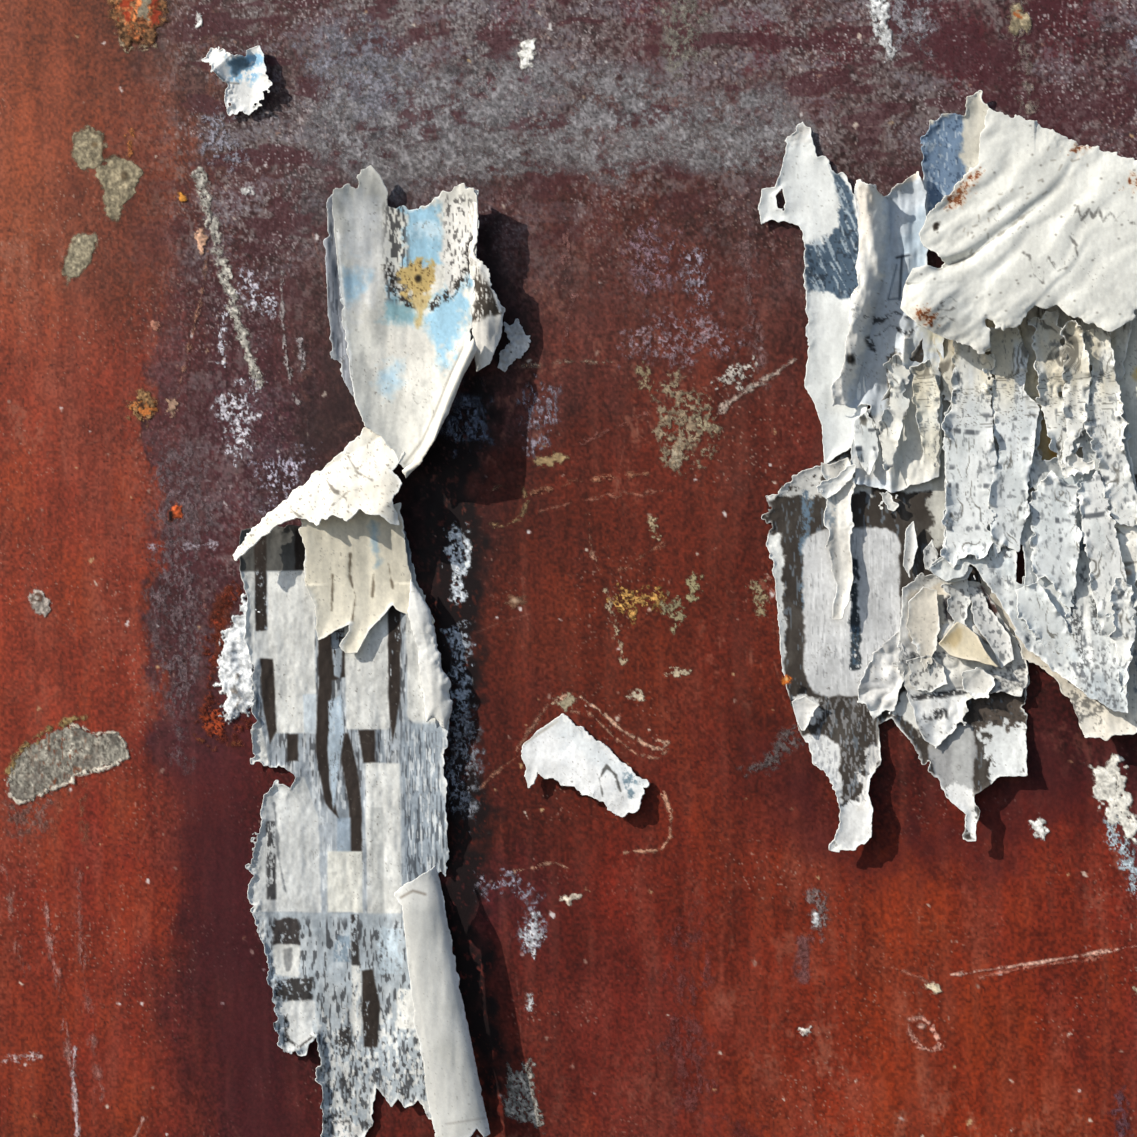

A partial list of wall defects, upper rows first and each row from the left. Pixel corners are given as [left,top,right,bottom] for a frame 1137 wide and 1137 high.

rust [107,0,169,53]
rust [1009,4,1031,55]
peeling [72,125,143,221]
peeling [62,233,97,280]
rust [127,389,178,421]
rust [168,505,182,521]
rust [193,580,252,751]
peeling [5,715,130,836]
peeling [1029,818,1049,840]
peeling [504,1058,544,1128]